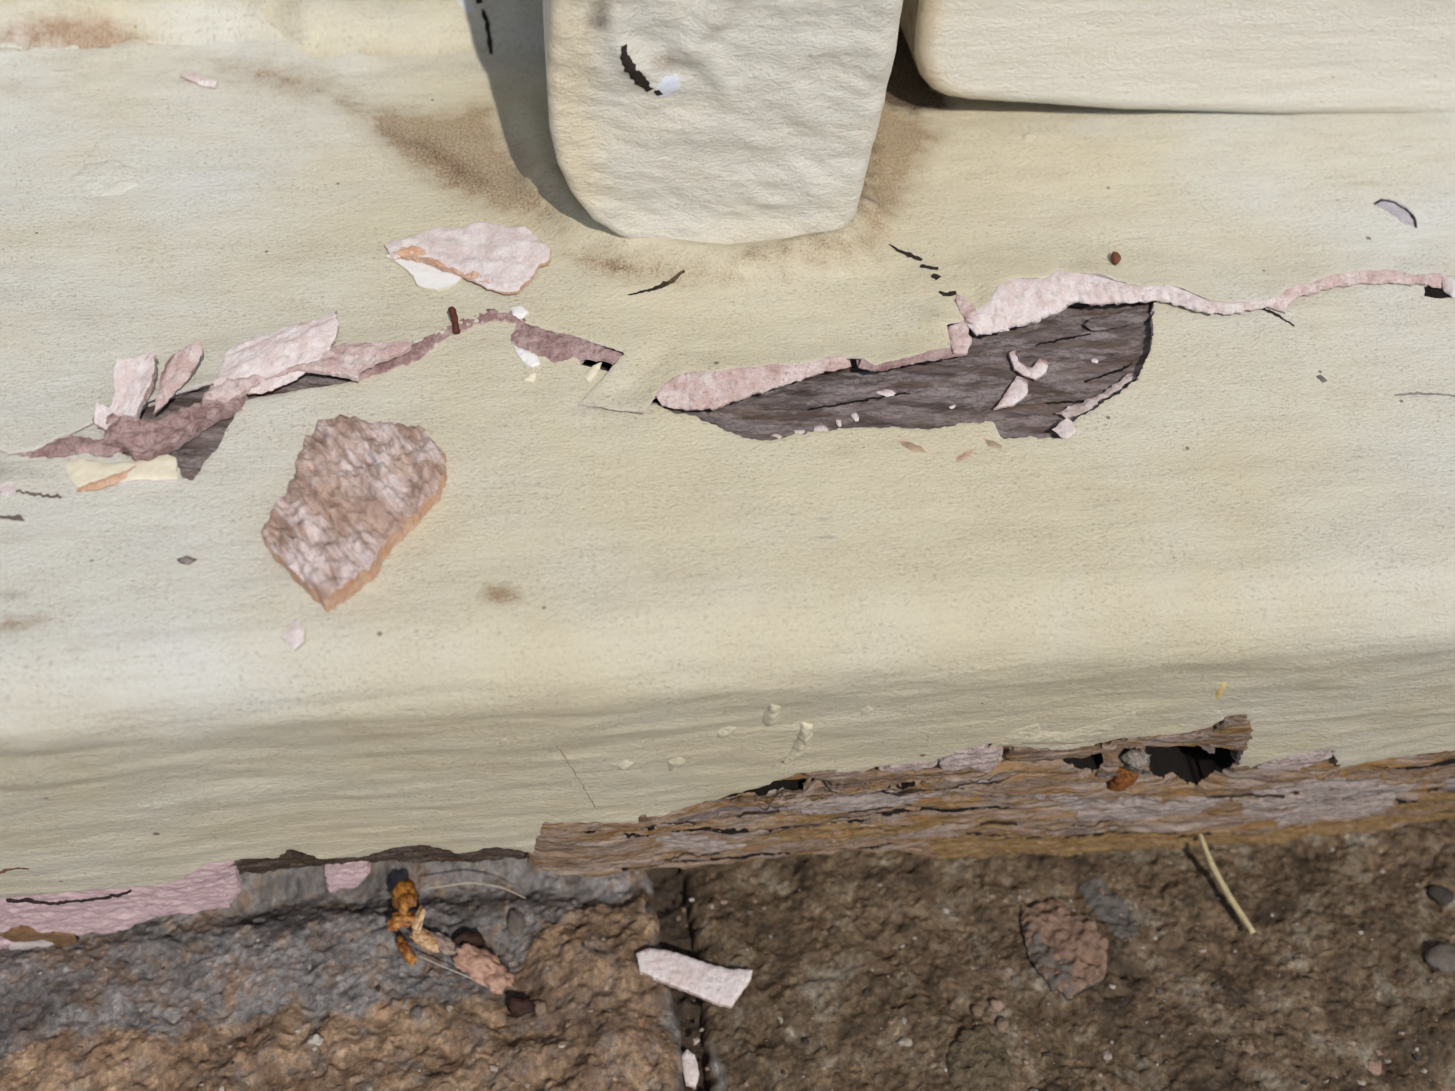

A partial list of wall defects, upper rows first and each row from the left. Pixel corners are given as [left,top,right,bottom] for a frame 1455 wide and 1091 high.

crack [476,0,493,54]
peeling [0,305,624,499]
peeling [652,270,1455,441]